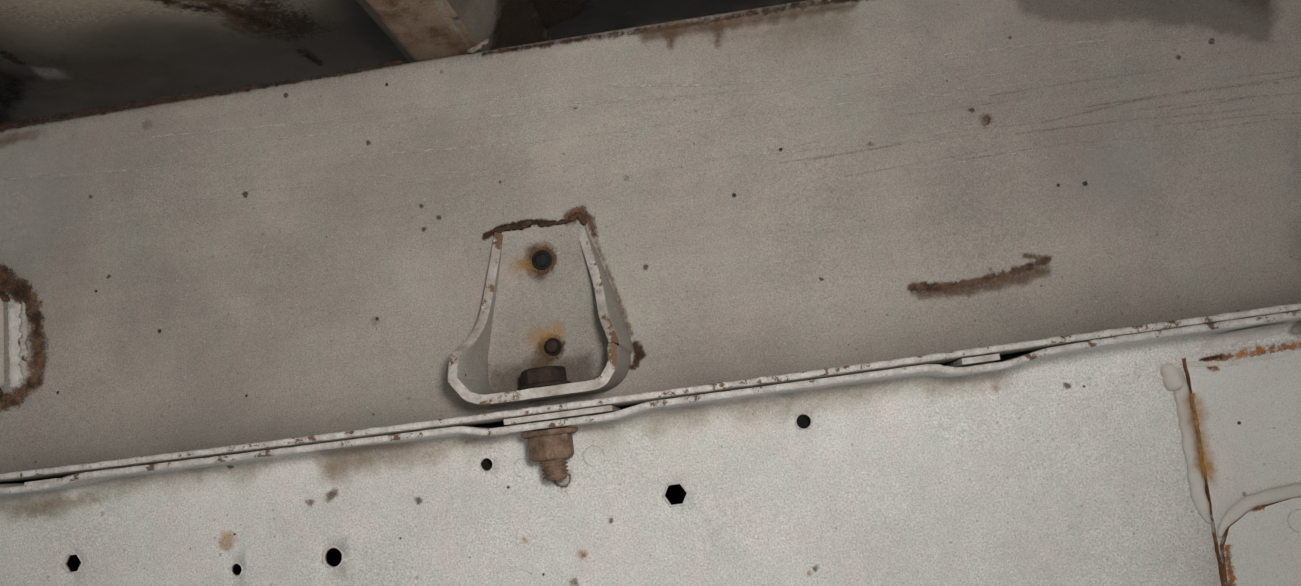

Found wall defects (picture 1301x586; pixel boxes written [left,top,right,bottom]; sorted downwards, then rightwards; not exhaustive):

rust [482,205,646,370]
rust [908,254,1051,297]
rust [0,265,48,412]
rust [1188,342,1301,371]
rust [1190,393,1210,476]
rust [1224,544,1237,586]